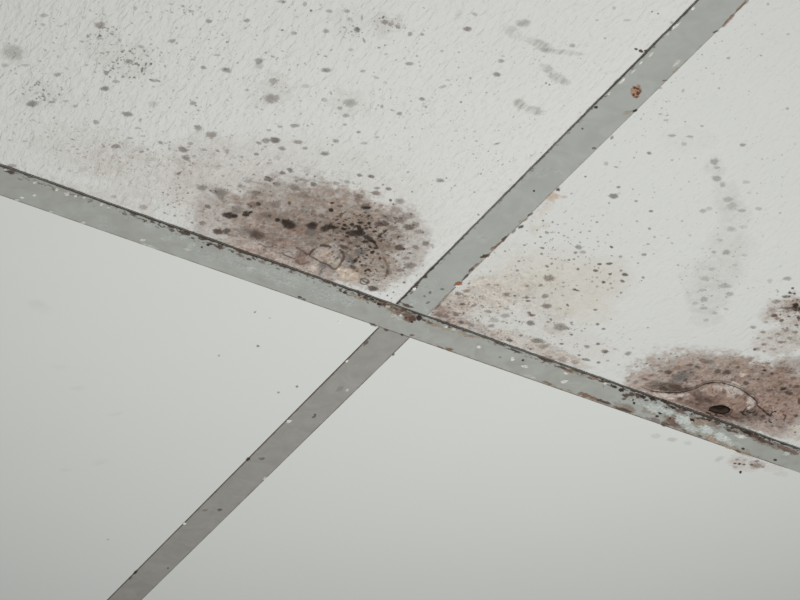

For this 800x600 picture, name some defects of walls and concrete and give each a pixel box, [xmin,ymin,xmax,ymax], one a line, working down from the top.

damp [207,177,413,291]
rust [454,213,533,286]
rust [363,297,439,326]
peeling [603,382,798,461]
damp [626,349,800,436]